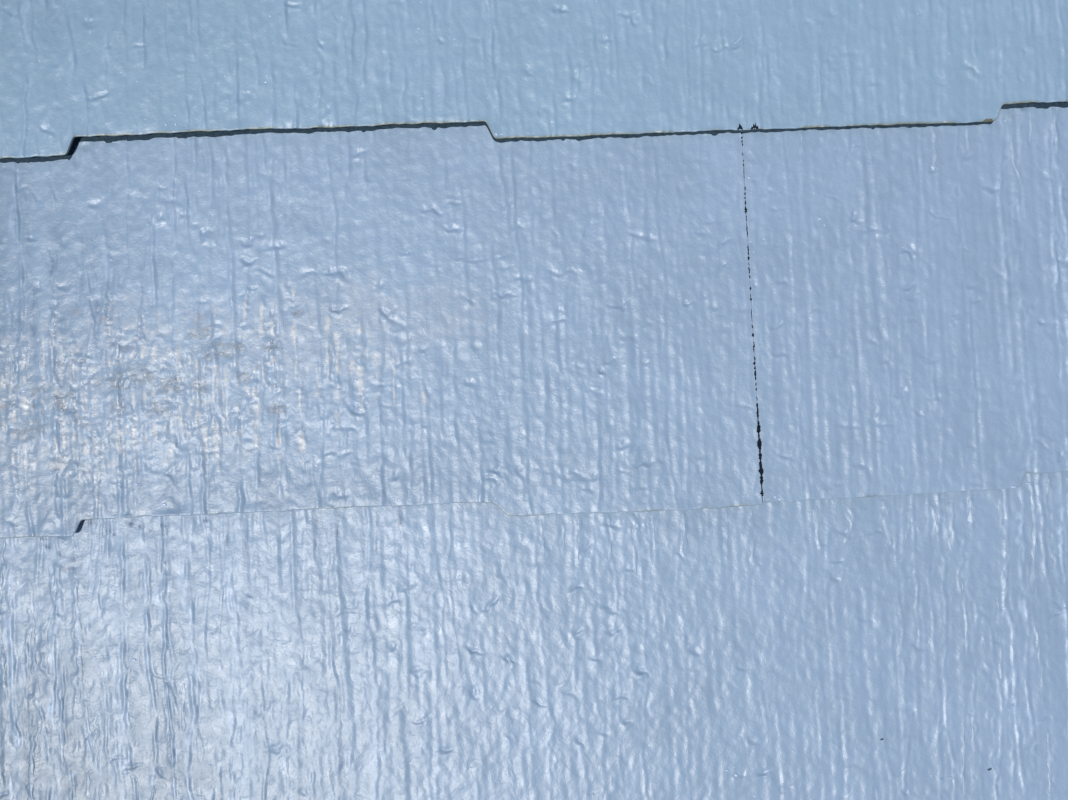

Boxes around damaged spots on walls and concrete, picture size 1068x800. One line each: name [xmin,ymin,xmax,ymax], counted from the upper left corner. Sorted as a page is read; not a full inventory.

crack [741,132,764,496]